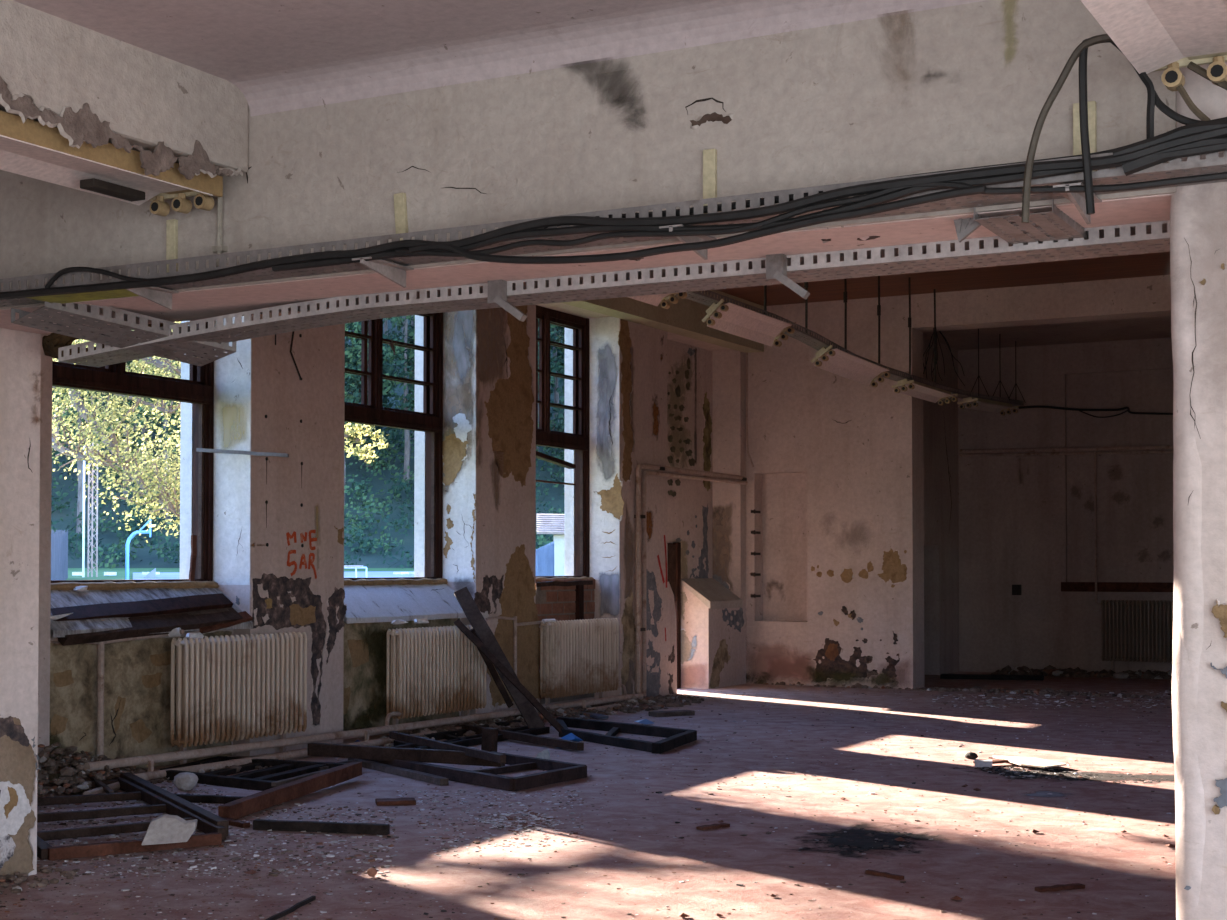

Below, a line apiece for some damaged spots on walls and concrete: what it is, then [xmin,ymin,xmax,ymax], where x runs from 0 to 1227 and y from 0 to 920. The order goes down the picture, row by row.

flaking render [0,76,244,180]
flaking render [442,413,472,486]
flaking render [484,305,535,487]
damp [597,344,634,480]
peeling [236,573,460,731]
flaking render [470,494,595,711]
flaking render [621,348,712,697]
flaking render [709,608,744,689]
peeling [812,606,900,682]
flaking render [811,549,907,588]
flaking render [0,631,232,876]
peeling [1212,778,1227,815]